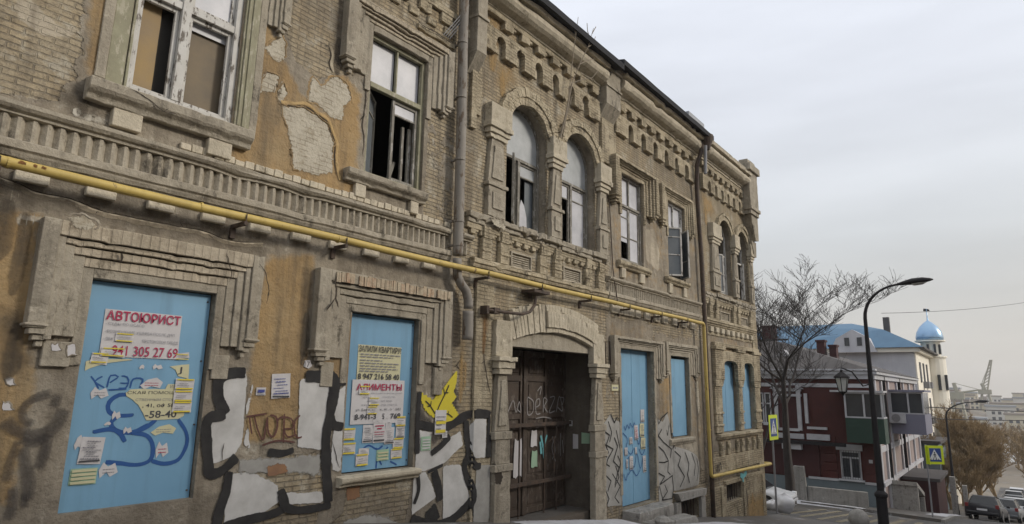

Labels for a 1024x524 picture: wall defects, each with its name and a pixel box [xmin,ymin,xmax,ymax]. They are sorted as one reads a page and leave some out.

peeling [260,35,353,176]
flaking render [267,463,288,476]